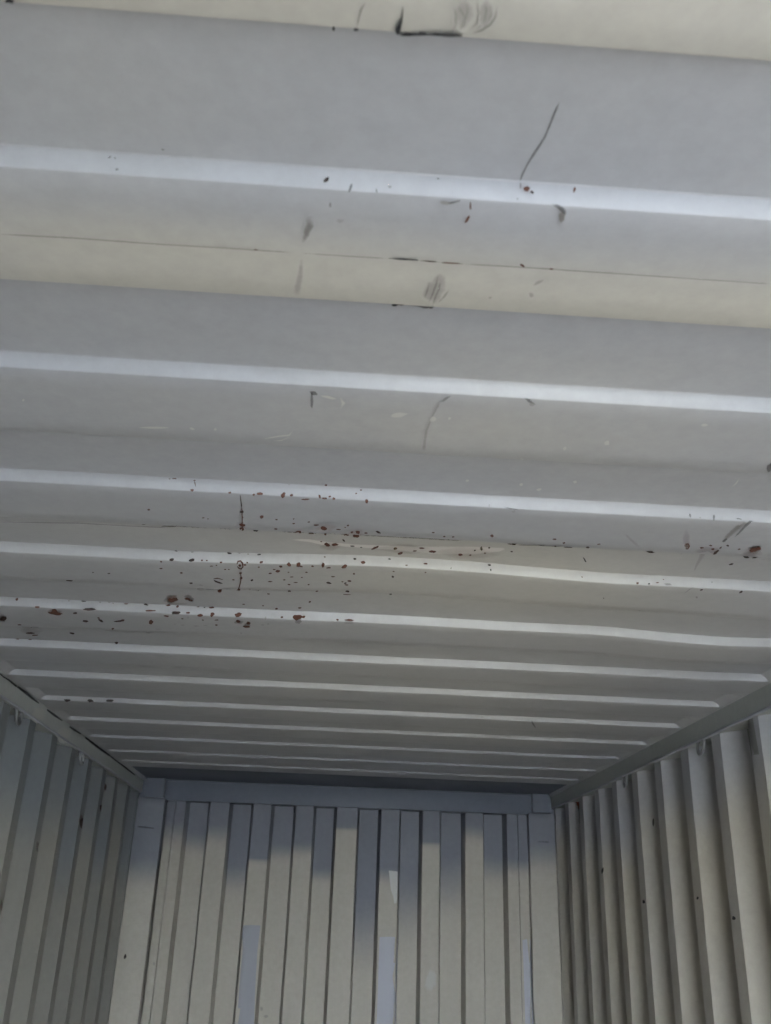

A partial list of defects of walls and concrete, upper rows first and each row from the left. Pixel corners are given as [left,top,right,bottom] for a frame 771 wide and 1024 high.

corrosion [292,518,381,542]
corrosion [144,552,365,634]
corrosion [35,601,124,644]